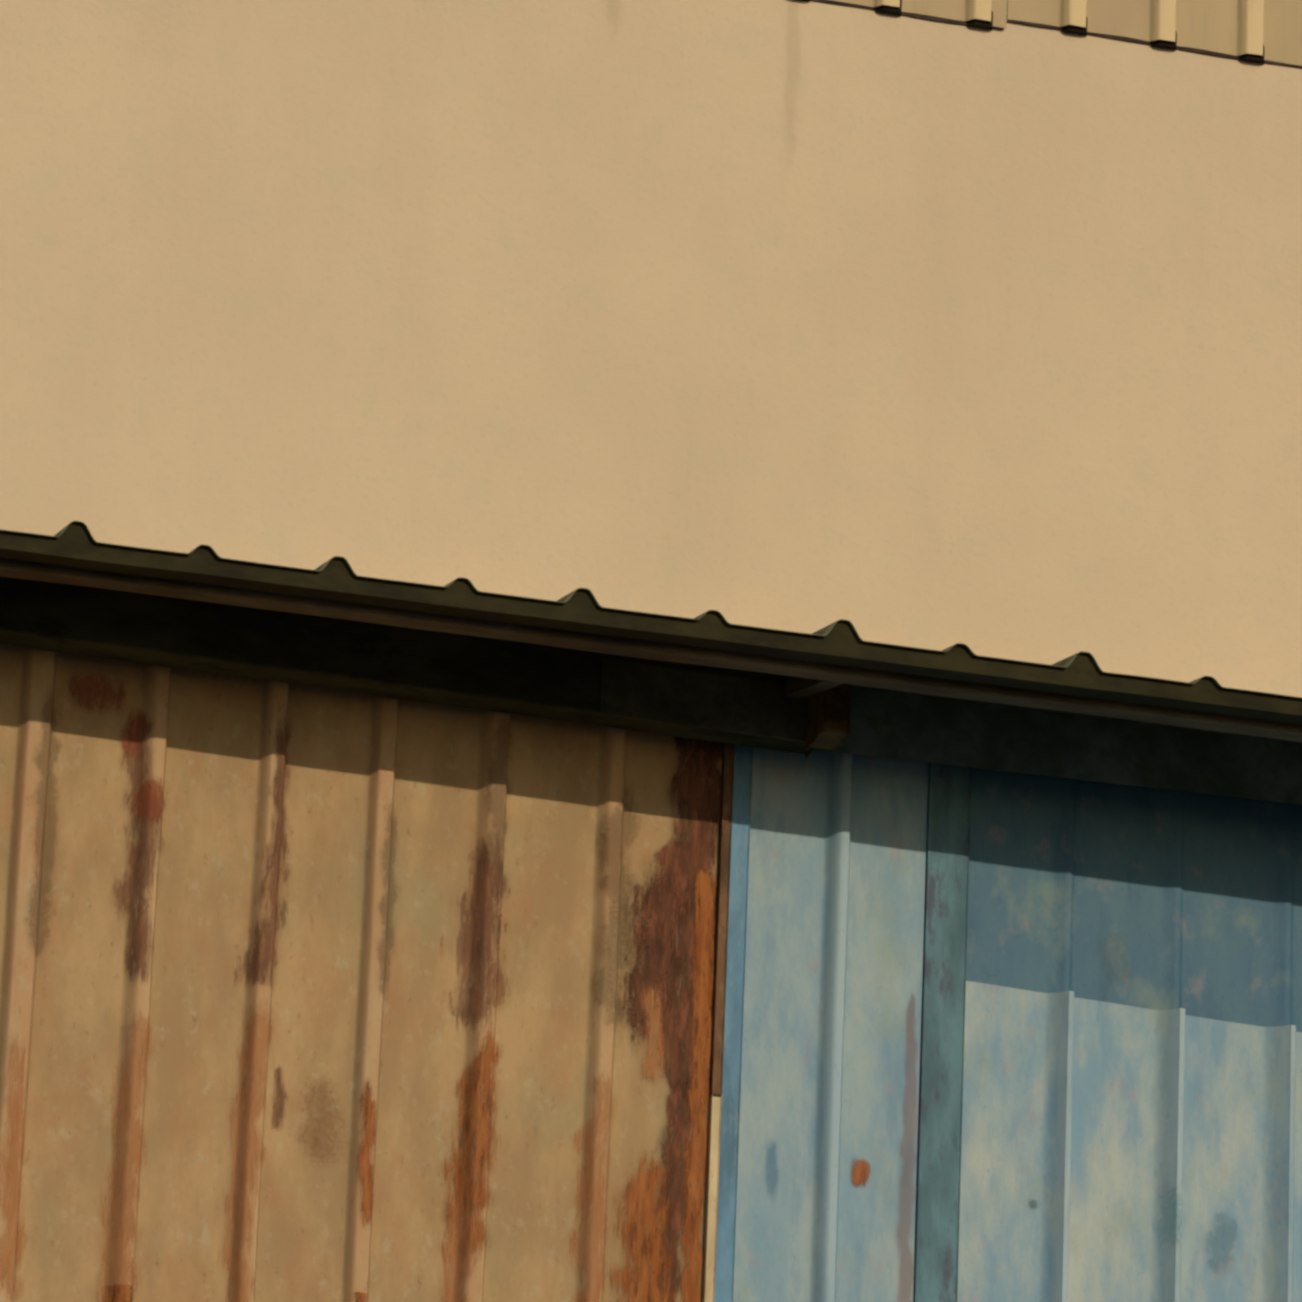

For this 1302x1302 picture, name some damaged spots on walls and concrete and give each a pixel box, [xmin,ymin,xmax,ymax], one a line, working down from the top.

corrosion [117,714,164,979]
corrosion [244,723,290,982]
corrosion [98,1016,152,1302]
corrosion [223,1013,285,1302]
corrosion [357,1082,376,1223]
corrosion [442,844,505,1302]
corrosion [571,737,723,1302]
corrosion [851,1159,870,1186]